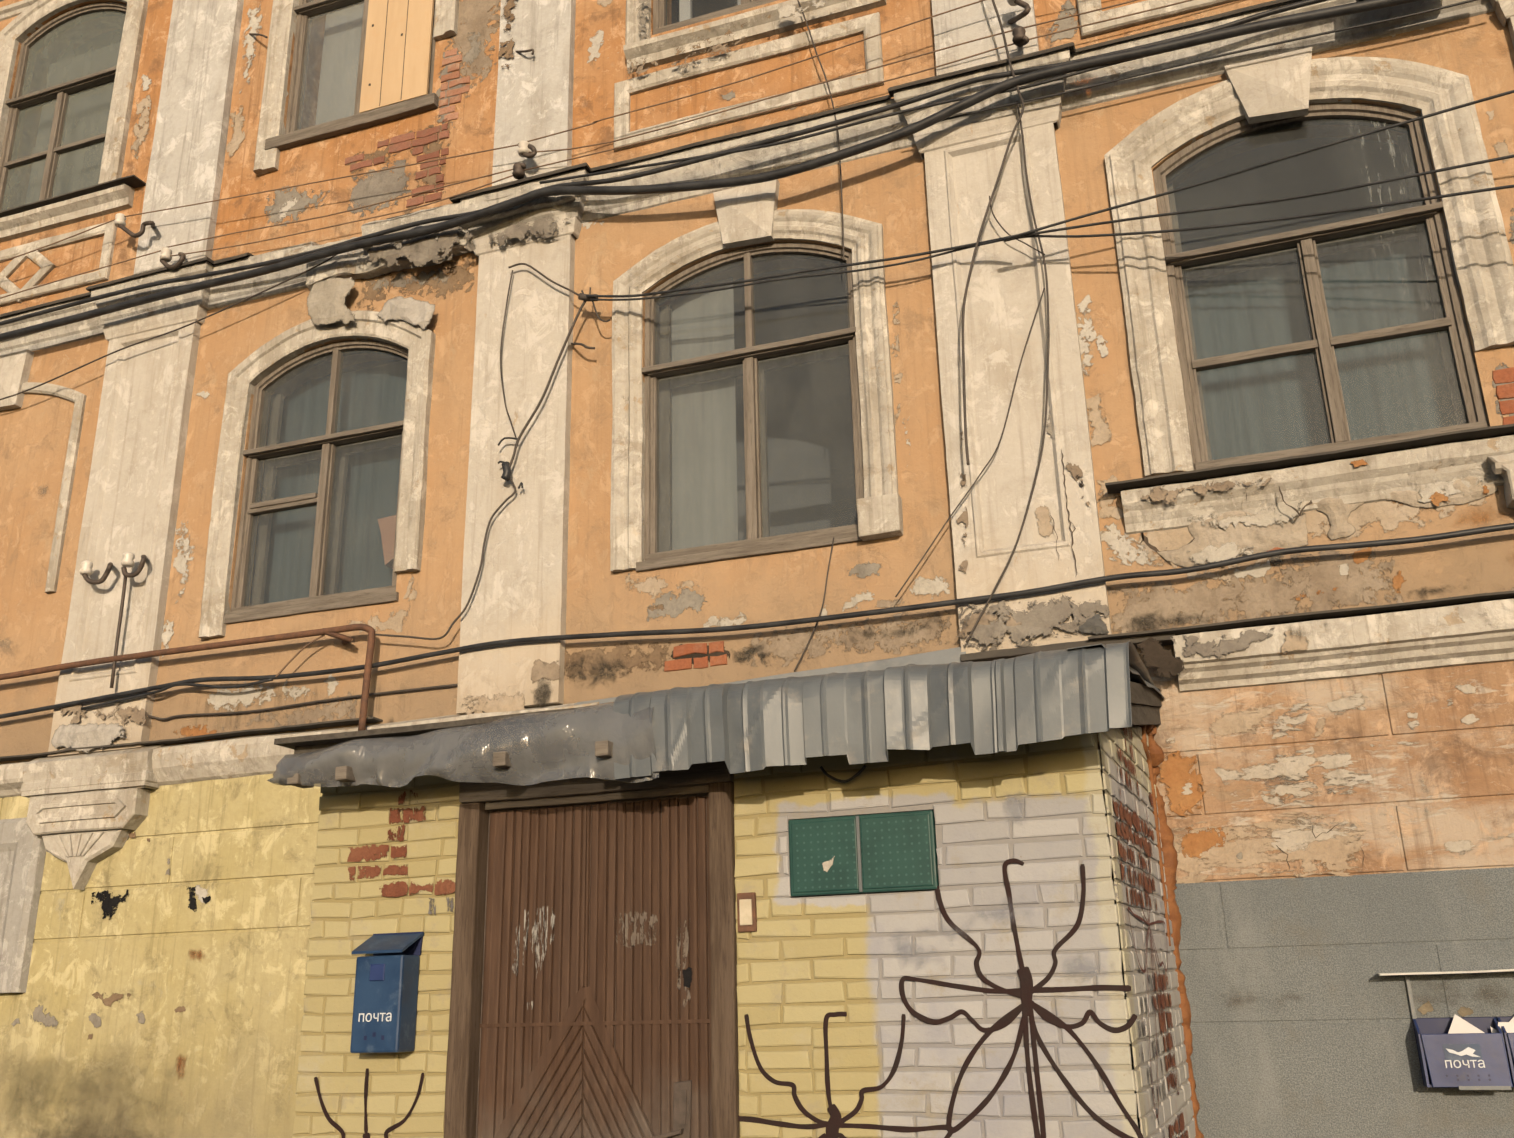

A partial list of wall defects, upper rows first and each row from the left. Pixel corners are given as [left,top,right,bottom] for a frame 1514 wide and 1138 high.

spalling [345,0,517,214]
peeling [1075,294,1109,377]
peeling [1086,393,1112,447]
crack [1246,487,1312,516]
flaking render [461,462,1487,715]
crack [1140,532,1195,565]
peeling [1447,684,1480,724]
peeling [1113,693,1375,910]